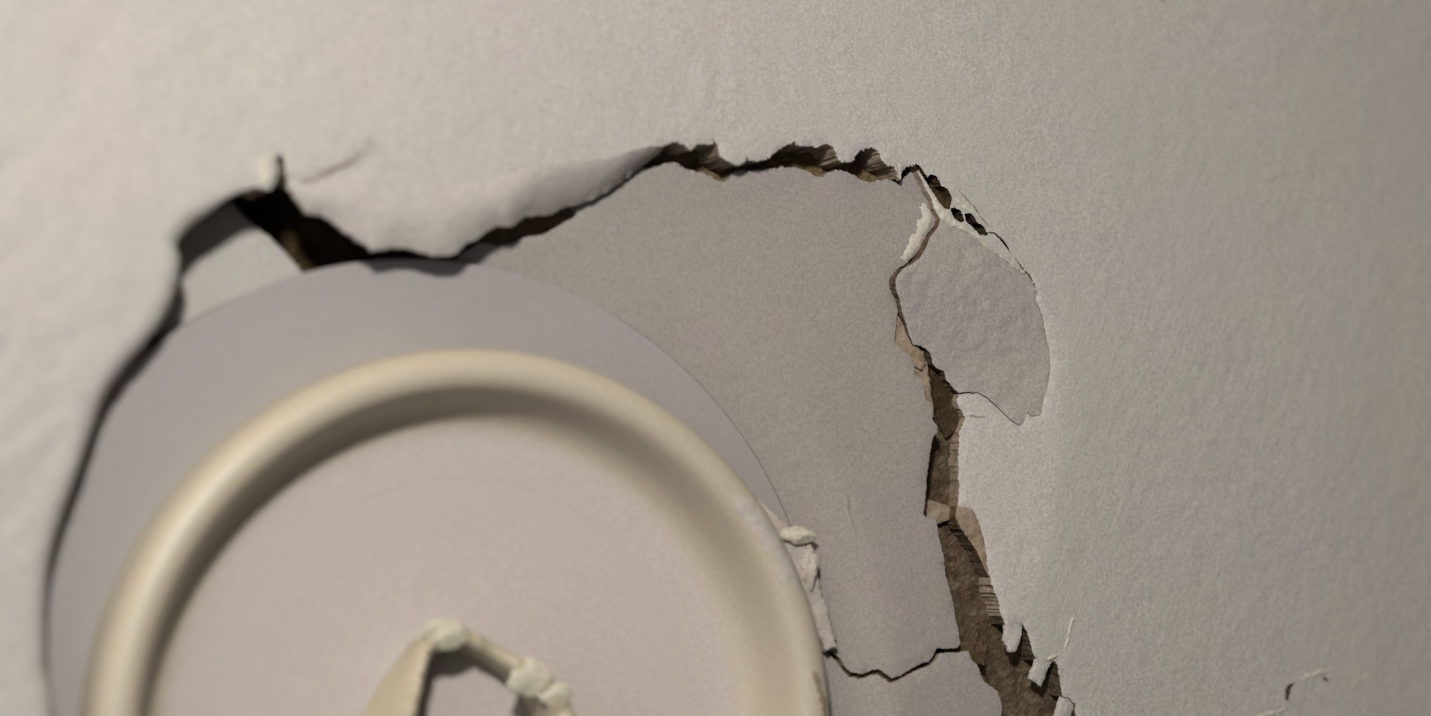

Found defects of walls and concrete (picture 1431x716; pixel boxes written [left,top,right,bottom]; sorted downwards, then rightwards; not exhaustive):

peeling [889,219,1050,425]
crack [826,316,1074,716]
crack [1256,669,1378,716]